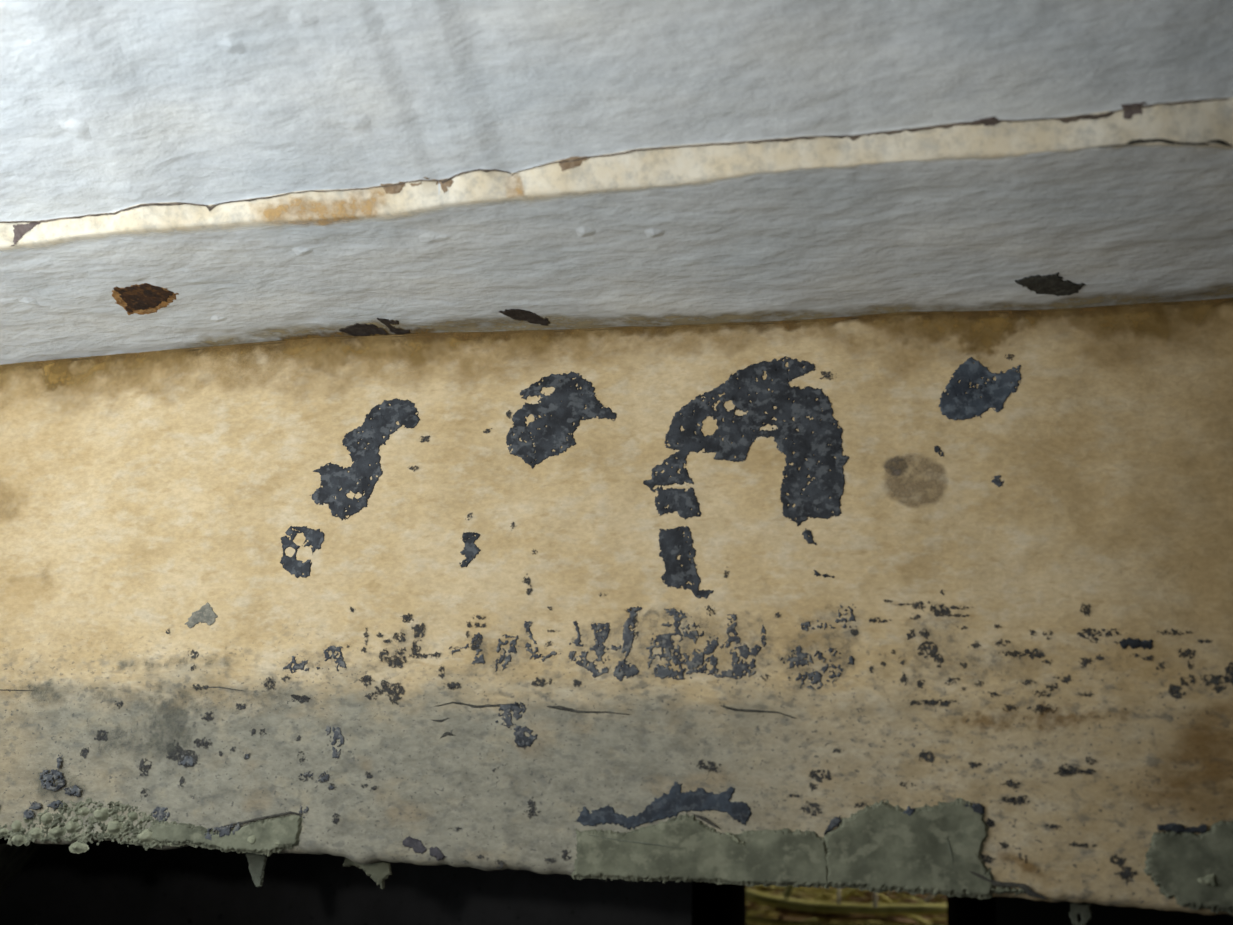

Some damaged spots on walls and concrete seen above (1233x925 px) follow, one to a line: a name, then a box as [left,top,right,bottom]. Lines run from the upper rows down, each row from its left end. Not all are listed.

crack [0,98,1232,223]
rust [112,283,179,315]
peeling [339,318,410,337]
peeling [499,309,550,326]
peeling [1015,272,1085,296]
peeling [938,354,1022,421]
leakage [885,445,944,506]
peeling [264,356,855,705]
peeling [185,602,218,628]
peeling [795,605,891,636]
peeling [166,737,250,787]
peeling [577,782,752,830]